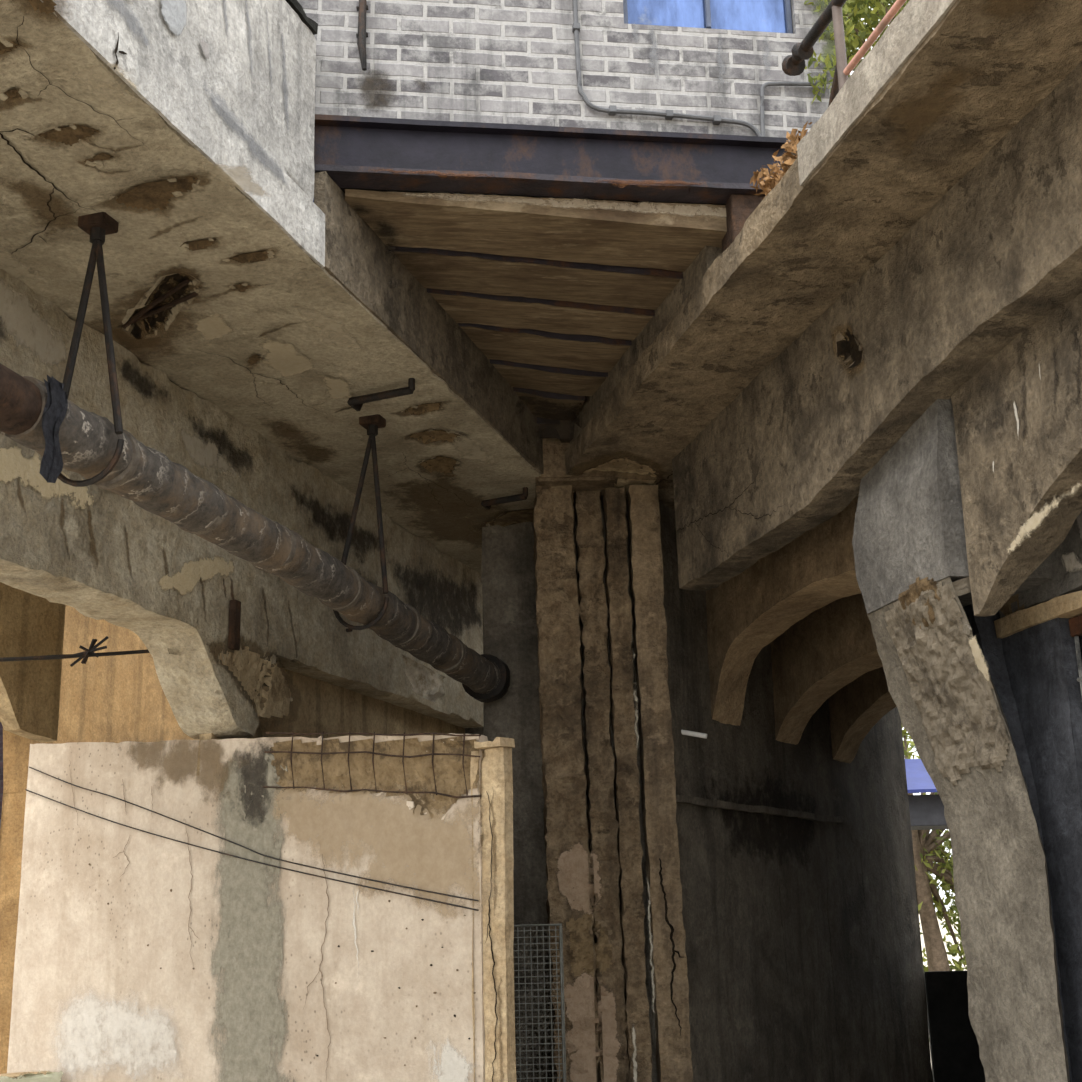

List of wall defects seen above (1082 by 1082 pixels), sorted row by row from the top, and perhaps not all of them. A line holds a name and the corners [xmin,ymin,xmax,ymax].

crack [0,128,99,253]
spalling [33,124,101,146]
crack [16,16,149,149]
spalling [102,176,209,215]
corrosion [377,169,495,178]
corrosion [605,180,697,188]
spalling [121,267,200,343]
peeling [1062,553,1082,570]
spalling [209,636,484,818]
spalling [884,577,1011,786]
leakage [130,734,496,1082]
crack [659,858,682,1036]